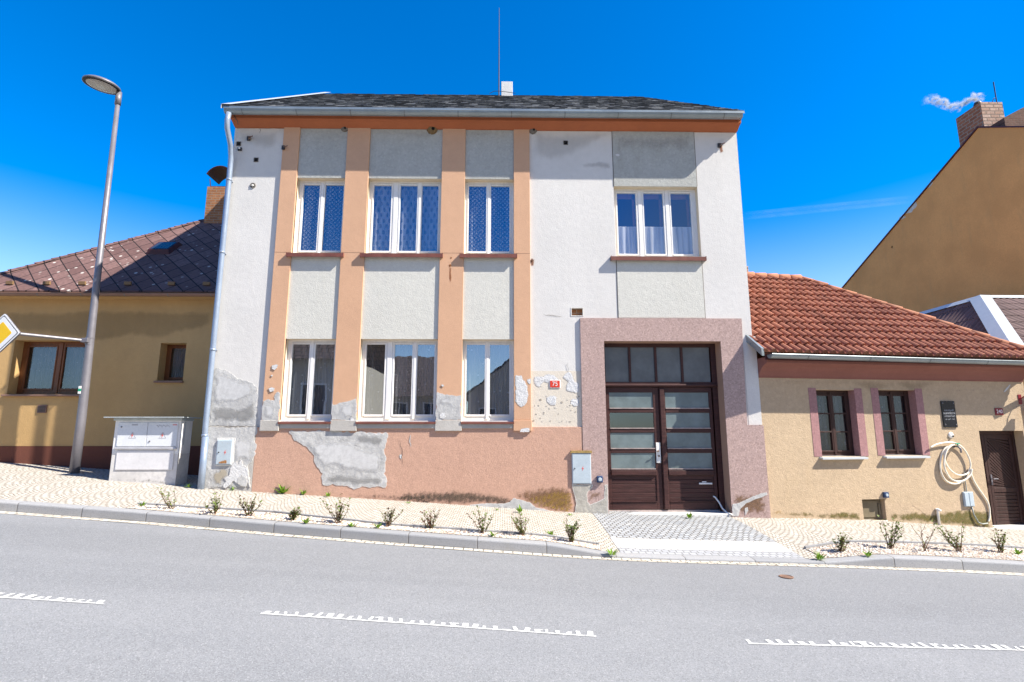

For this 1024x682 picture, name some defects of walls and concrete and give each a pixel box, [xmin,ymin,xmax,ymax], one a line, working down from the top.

flaking render [204,364,280,489]
flaking render [289,397,388,489]
peeling [435,384,462,420]
peeling [515,372,580,432]